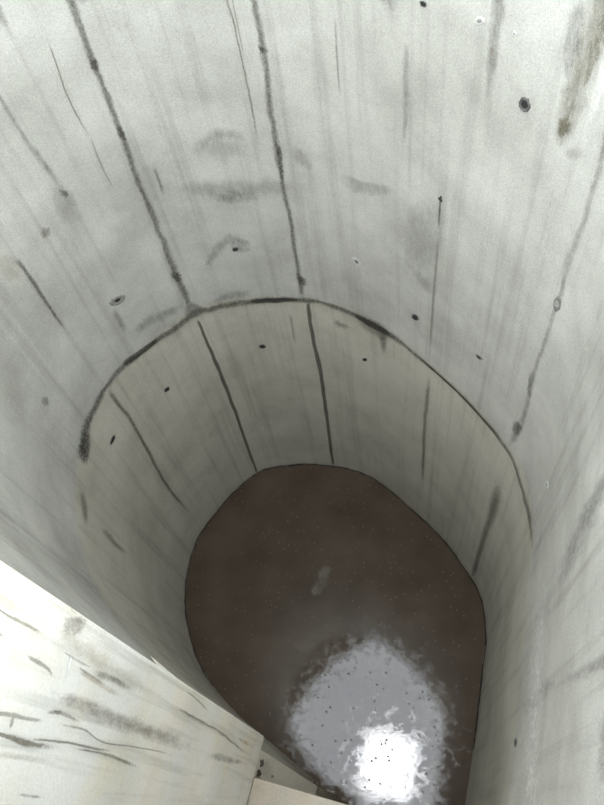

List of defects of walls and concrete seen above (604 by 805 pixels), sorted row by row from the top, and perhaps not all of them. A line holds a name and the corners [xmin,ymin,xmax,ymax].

crack [52,53,80,121]
crack [227,0,254,118]
leakage [559,60,581,134]